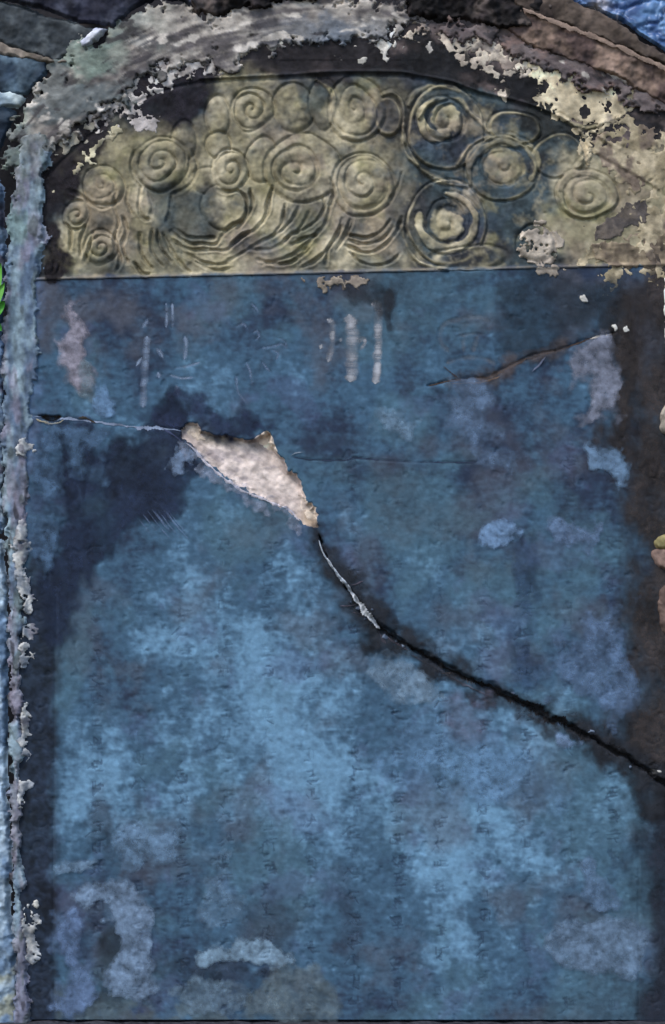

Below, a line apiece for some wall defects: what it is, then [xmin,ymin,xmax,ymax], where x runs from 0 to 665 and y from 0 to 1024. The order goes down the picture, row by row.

flaking render [52,58,225,175]
flaking render [368,21,665,288]
crack [429,334,612,386]
crack [35,415,187,445]
water stain [8,305,273,668]
spalling [181,423,318,532]
crack [292,452,405,462]
water stain [503,249,665,767]
crack [318,533,665,785]